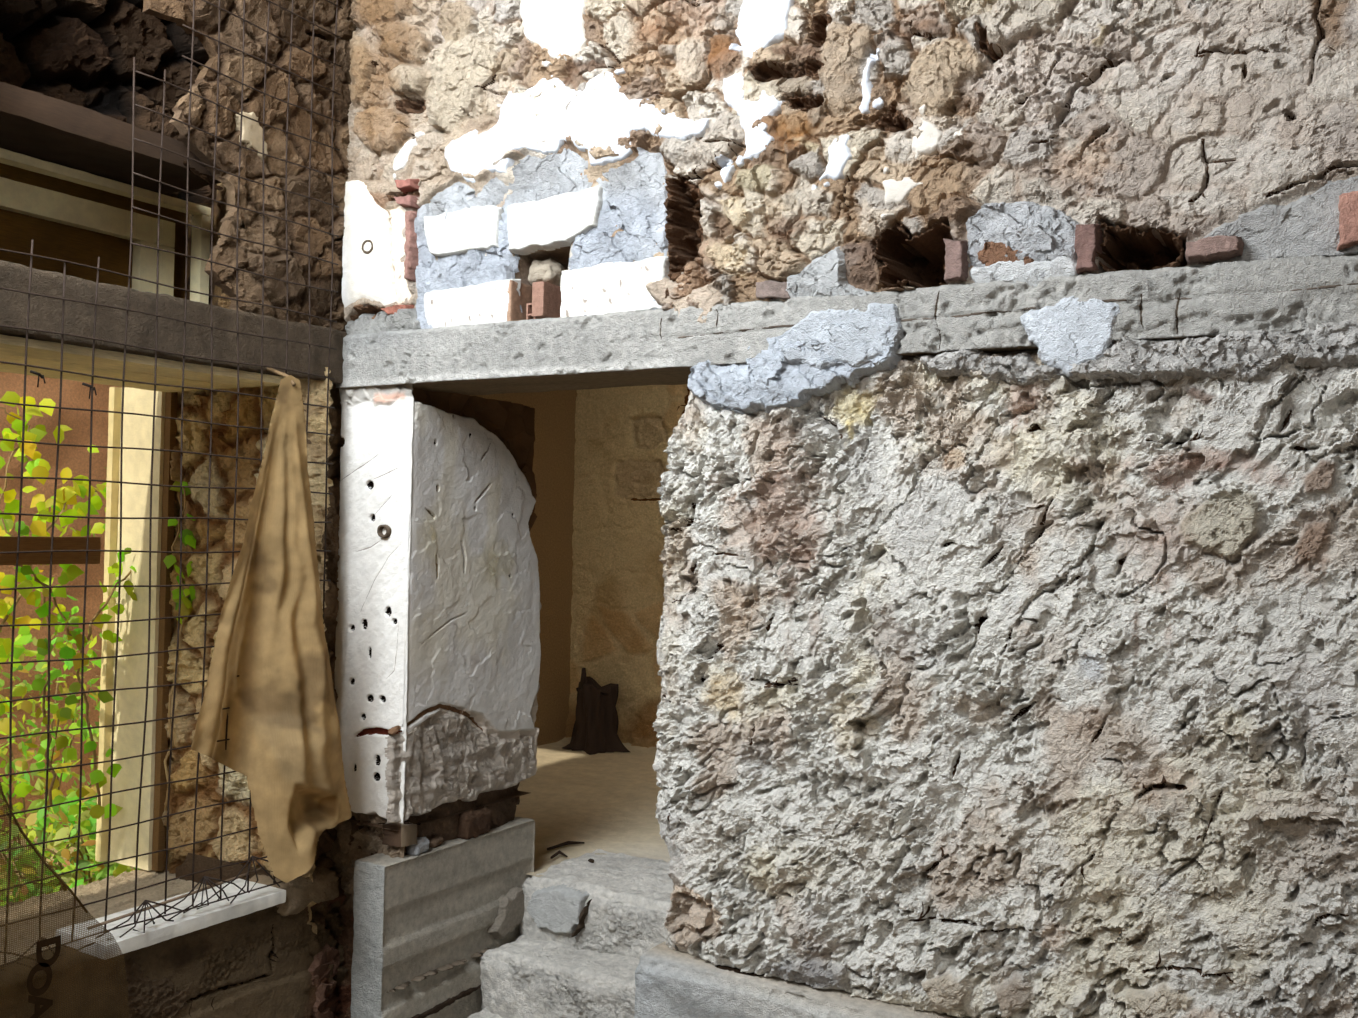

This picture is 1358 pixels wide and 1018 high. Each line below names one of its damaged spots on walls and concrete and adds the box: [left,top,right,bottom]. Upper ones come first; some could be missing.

flaking render [445,0,709,183]
spalling [663,0,833,298]
flaking render [342,132,425,321]
spalling [873,167,953,288]
spalling [1097,223,1187,272]
crack [1029,424,1041,432]
crack [970,616,1013,653]
spalling [384,713,536,823]
crack [1138,775,1222,842]
crack [909,847,1037,932]
crack [715,965,792,982]
crack [1142,949,1244,989]